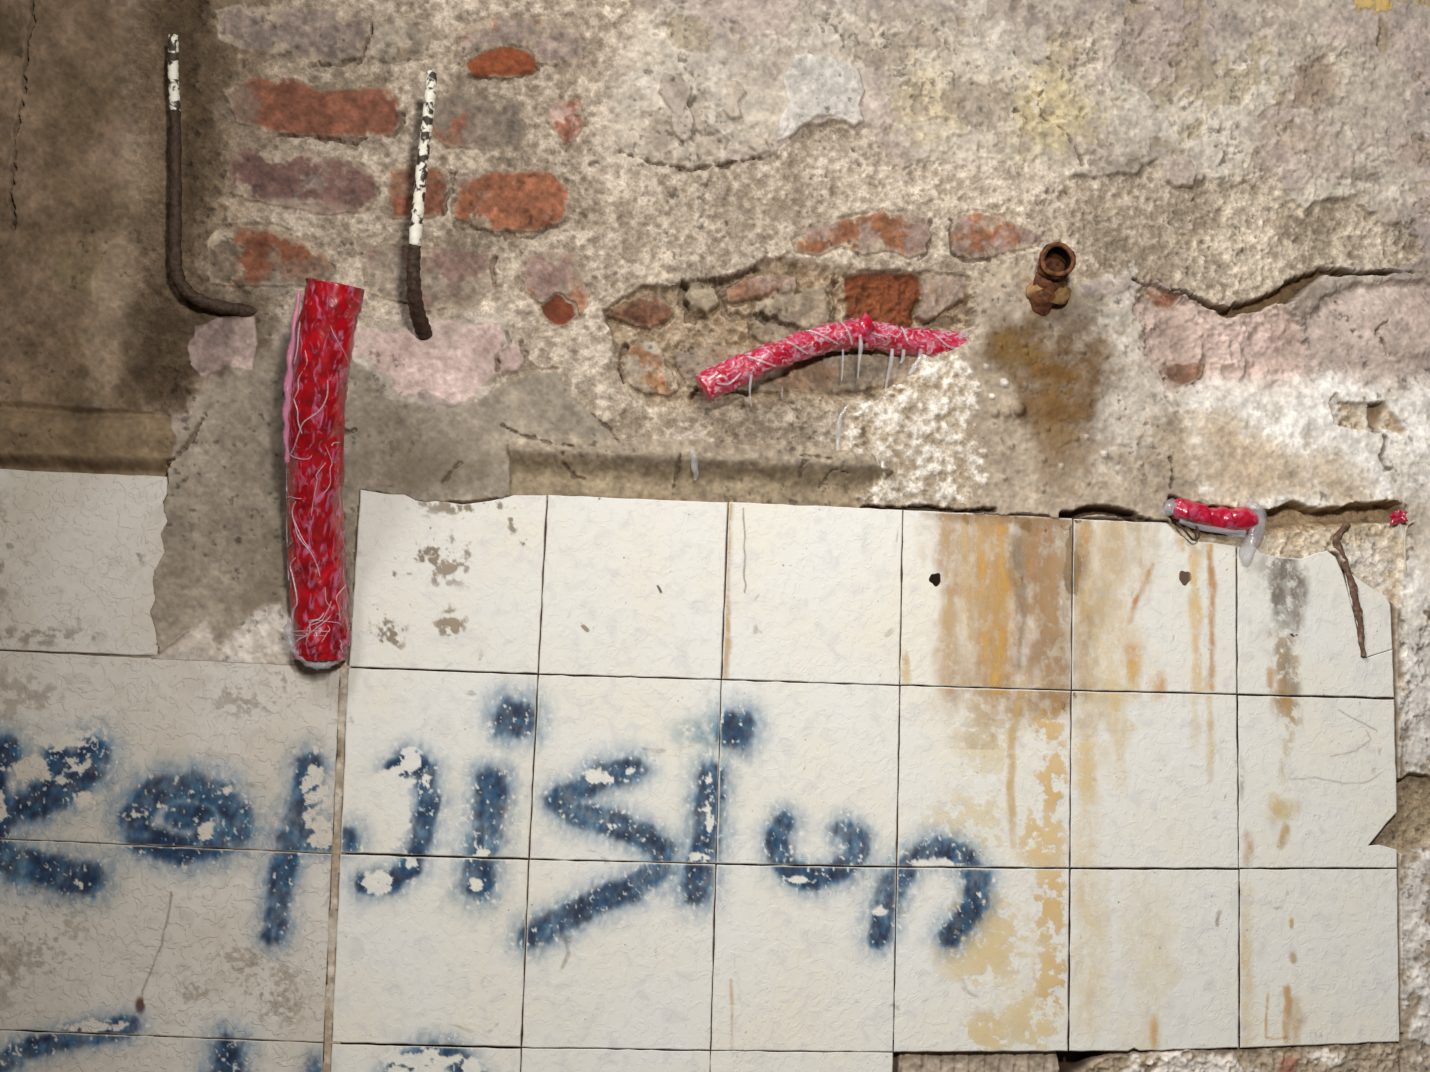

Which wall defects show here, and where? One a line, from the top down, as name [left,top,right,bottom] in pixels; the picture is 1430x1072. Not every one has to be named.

spalling [126,0,1425,453]
rust [988,314,1107,448]
rust [940,514,1092,712]
rust [1191,544,1215,644]
rust [1129,648,1137,683]
rust [1272,801,1289,846]
rust [1284,986,1296,1032]